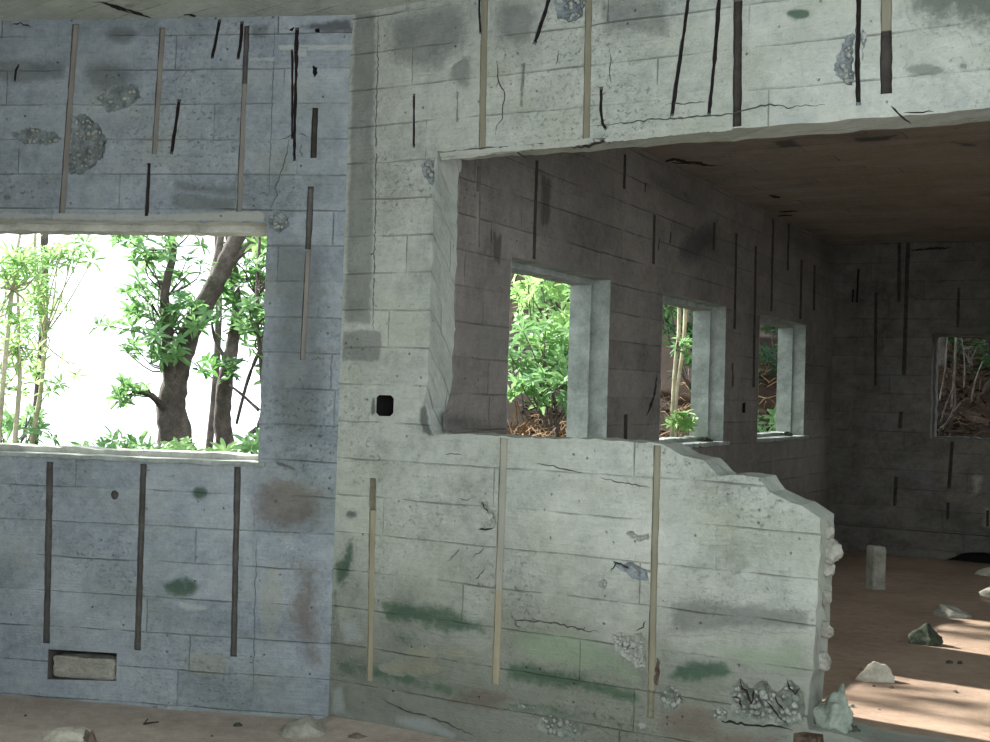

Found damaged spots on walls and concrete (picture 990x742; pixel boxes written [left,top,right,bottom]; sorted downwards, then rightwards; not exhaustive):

crack [97,2,151,18]
spalling [532,0,586,45]
water stain [904,0,990,46]
spalling [834,0,867,106]
water stain [903,61,968,78]
spalling [11,114,107,175]
crack [572,101,825,149]
crack [891,106,933,124]
water stain [249,0,476,450]
water stain [241,461,330,645]
crack [512,616,600,633]
spalling [712,679,824,742]